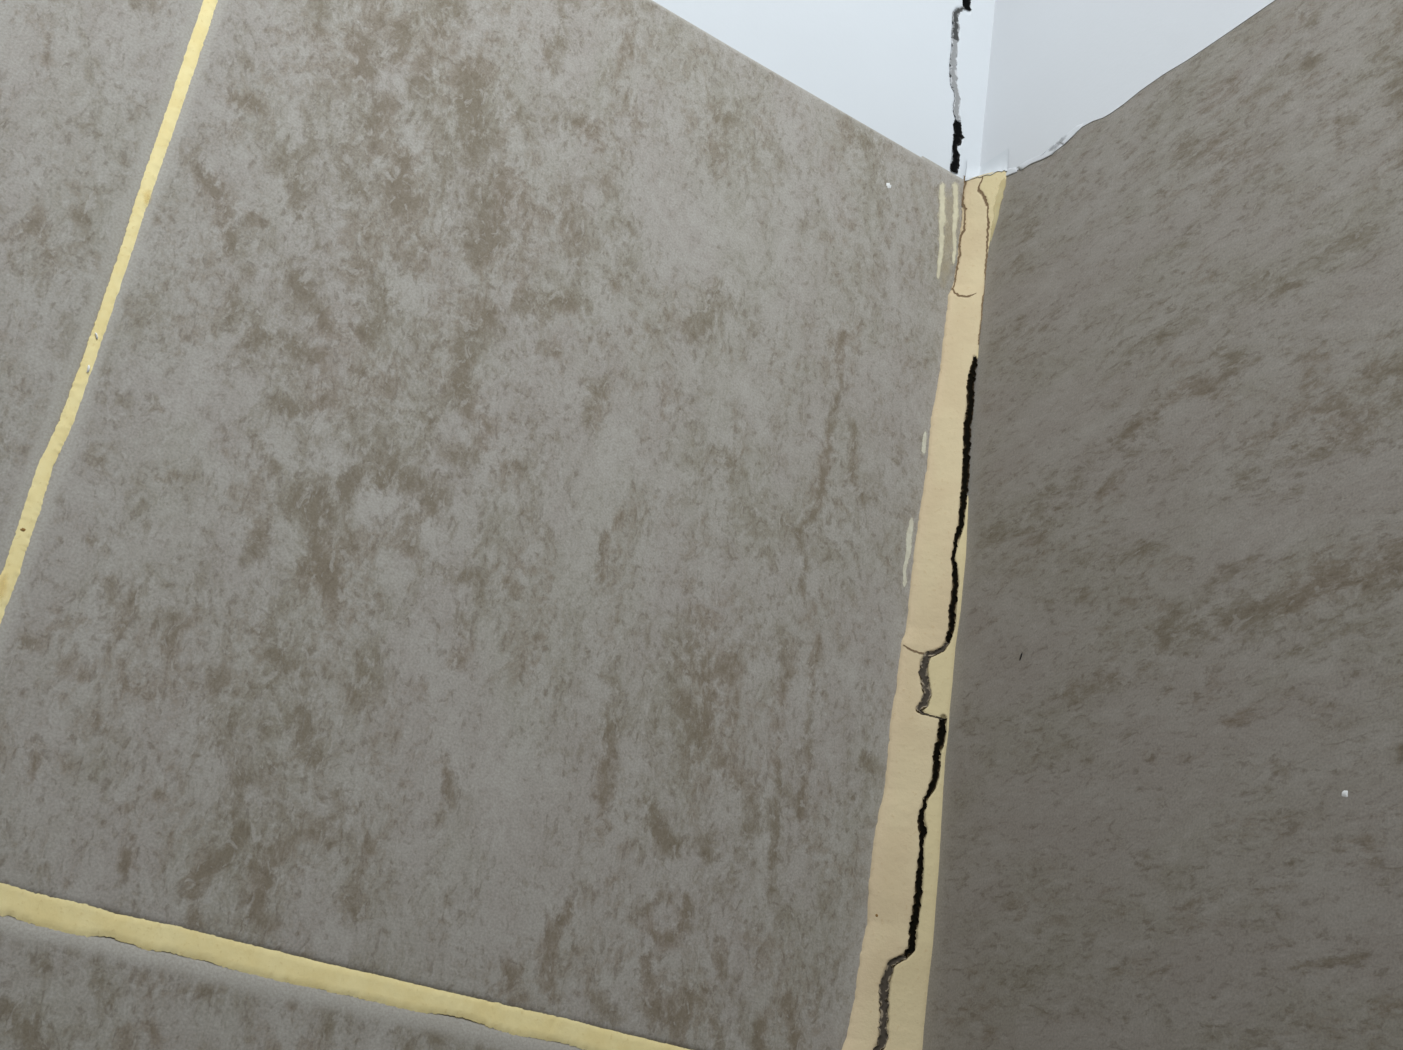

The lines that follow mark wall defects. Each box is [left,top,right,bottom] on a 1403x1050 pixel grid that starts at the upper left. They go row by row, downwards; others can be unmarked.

crack [873,0,990,1050]